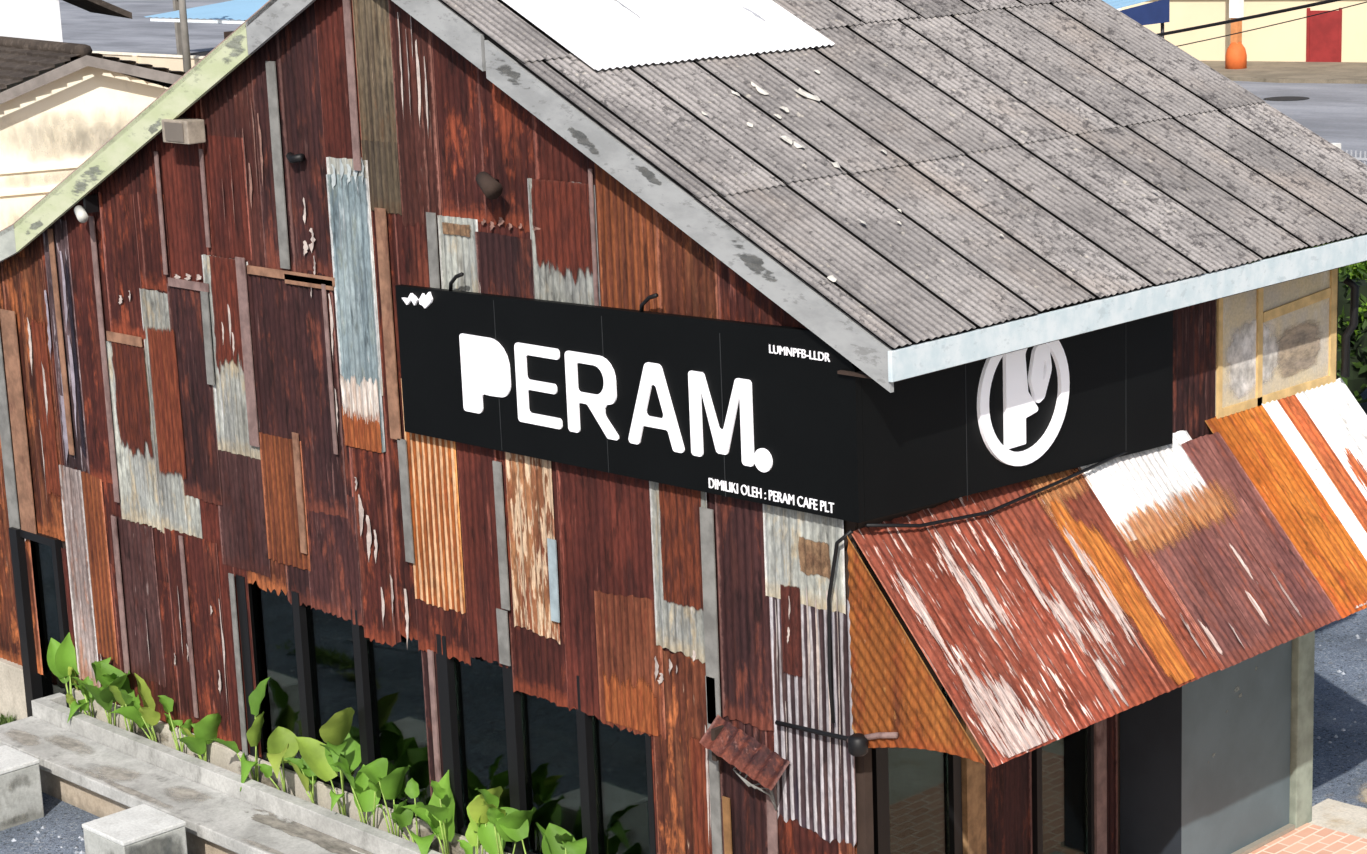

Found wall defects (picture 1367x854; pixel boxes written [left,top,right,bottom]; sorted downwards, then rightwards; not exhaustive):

rust [30,317,62,499]
rust [111,327,186,480]
rust [209,256,244,374]
rust [342,406,382,453]
water stain [1227,320,1320,398]
rust [1342,445,1367,491]
rust [659,483,703,610]
rust [780,537,831,677]
rust [1029,467,1235,685]
rust [603,674,659,736]
rust [690,736,712,854]